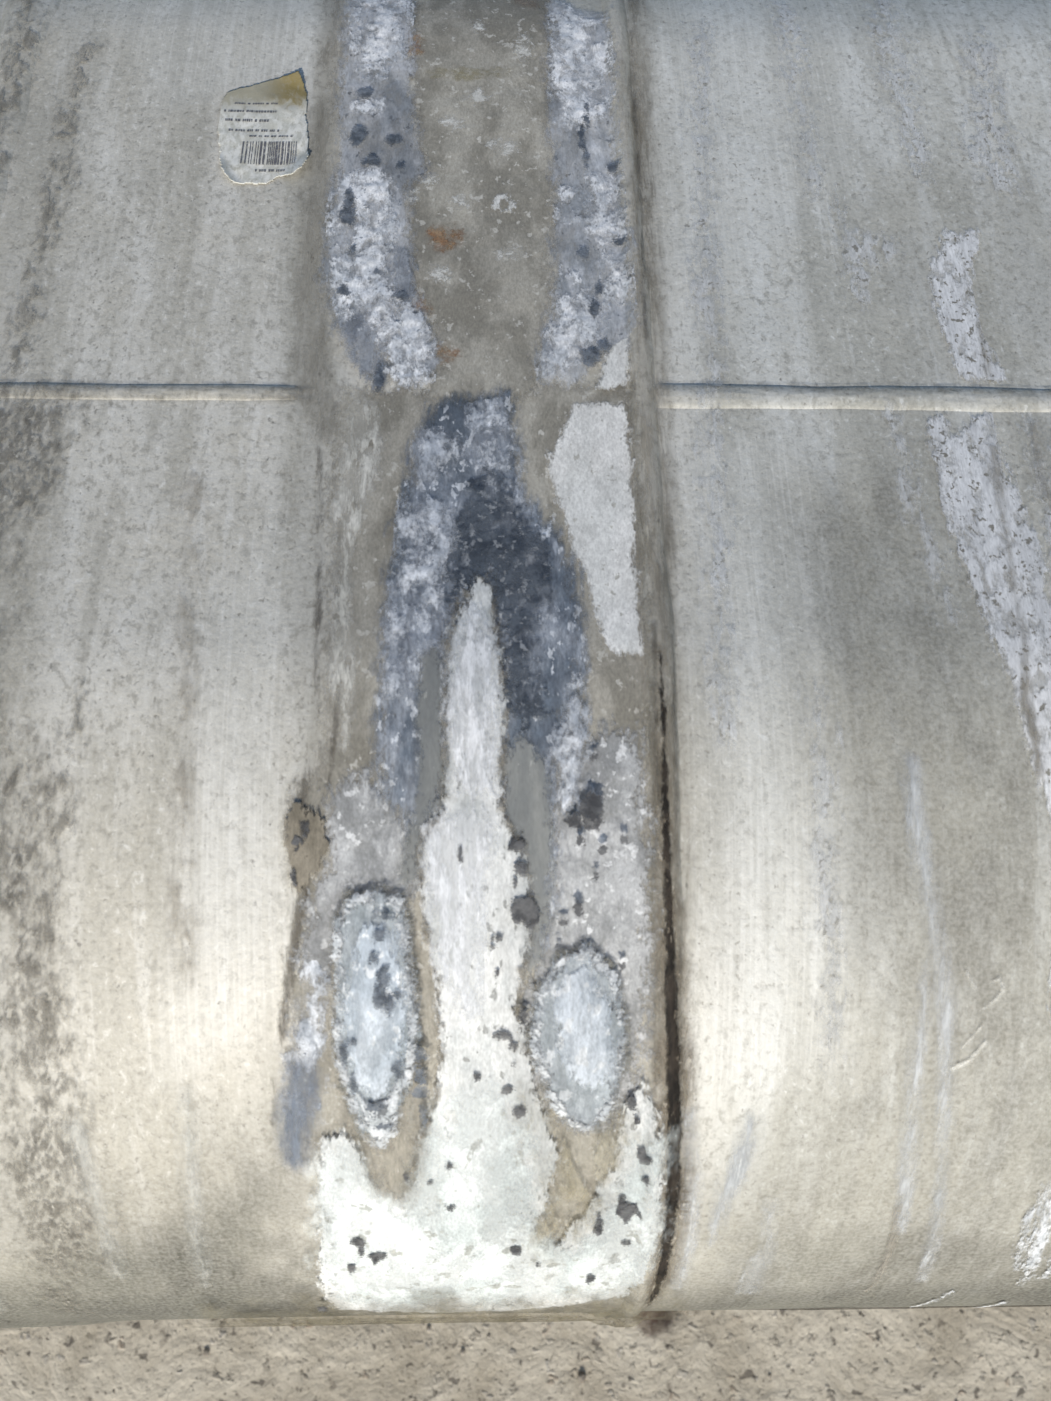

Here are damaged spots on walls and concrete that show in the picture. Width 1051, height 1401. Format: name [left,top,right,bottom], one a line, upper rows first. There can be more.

leakage [930,229,1006,383]
peeling [329,401,382,748]
peeling [545,337,643,656]
leakage [885,409,1051,812]
spalling [283,802,329,893]
peeling [310,577,667,1313]
crack [647,631,692,1306]
leakage [942,1005,951,1074]
leakage [1015,1192,1051,1279]